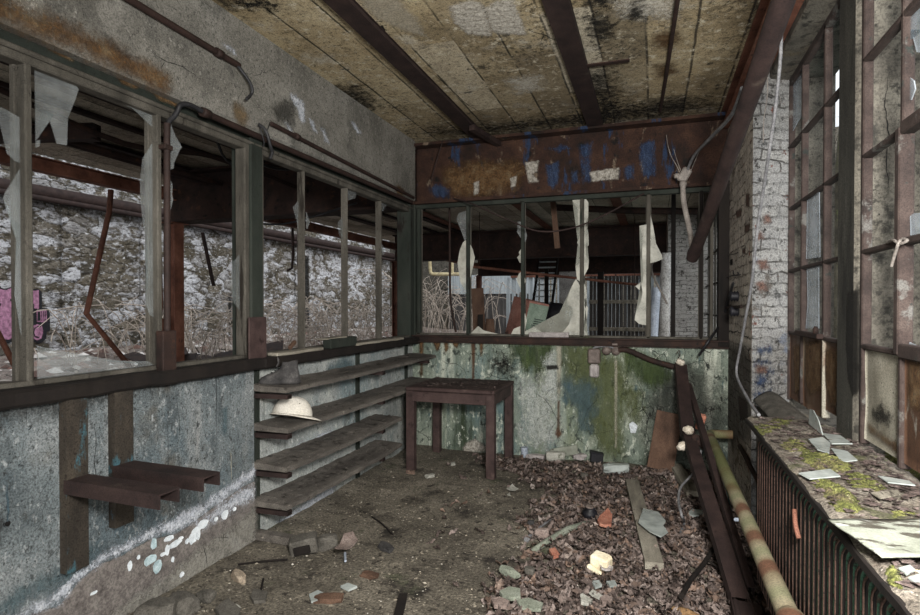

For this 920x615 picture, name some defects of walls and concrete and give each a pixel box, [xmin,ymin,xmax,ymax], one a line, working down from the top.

damp [217,0,278,18]
damp [577,0,679,47]
corrosion [0,0,177,106]
damp [590,66,721,123]
damp [478,111,586,135]
peeling [618,141,655,180]
spalling [730,193,771,240]
damp [519,346,561,451]
damp [0,467,257,615]